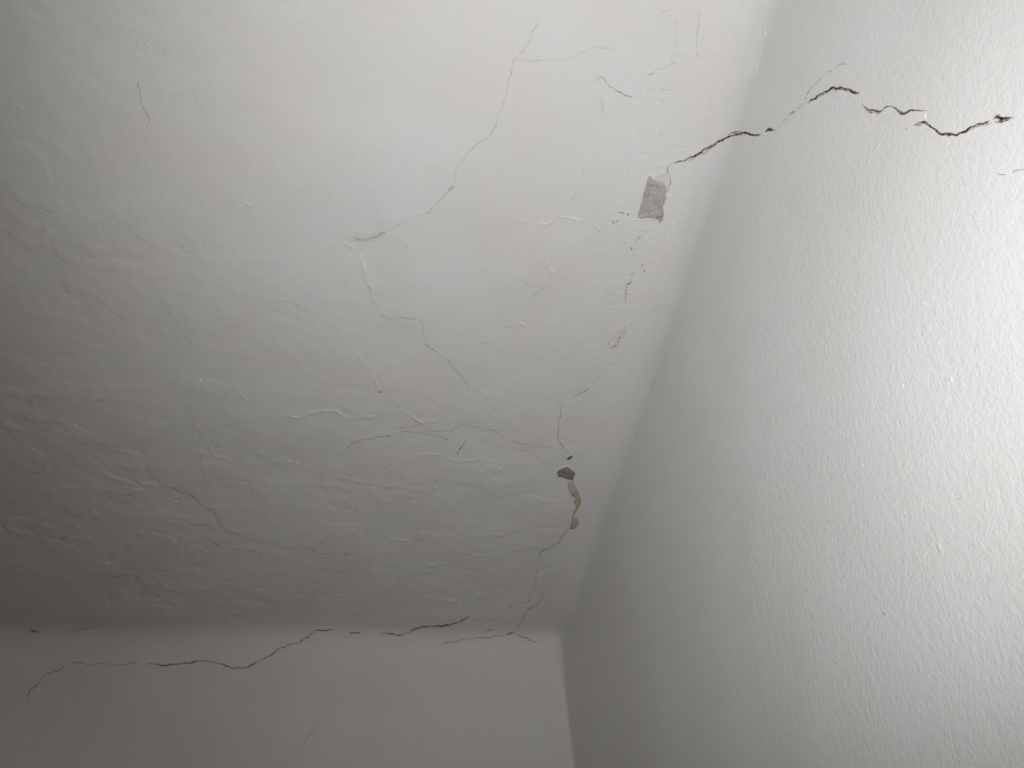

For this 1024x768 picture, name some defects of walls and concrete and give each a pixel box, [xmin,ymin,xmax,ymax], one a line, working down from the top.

crack [675,86,1010,163]
spalling [612,171,671,223]
spalling [553,454,581,529]
crack [386,617,481,642]